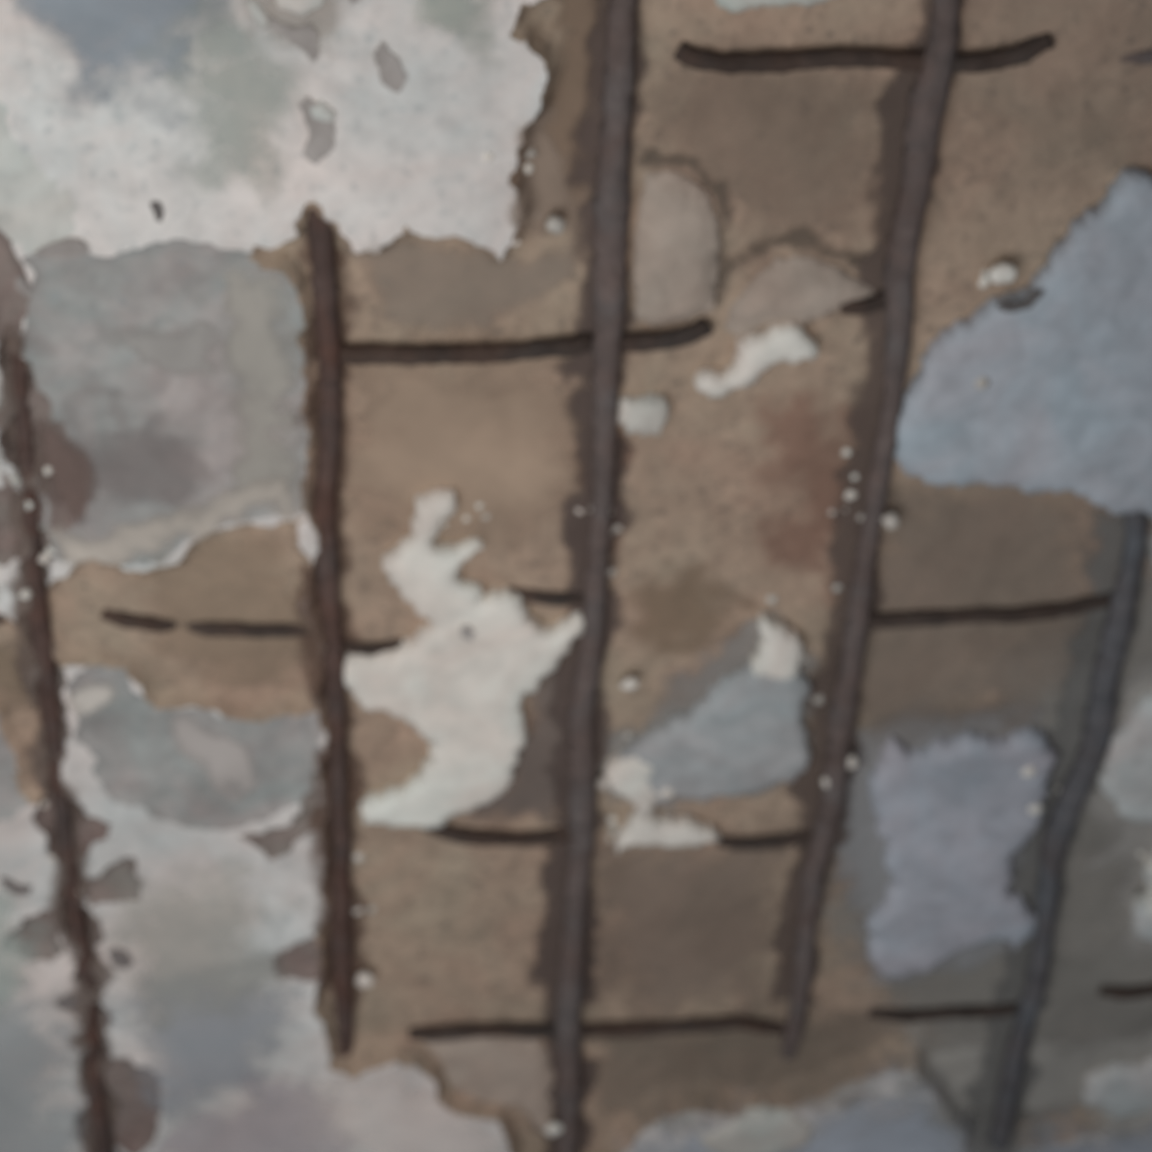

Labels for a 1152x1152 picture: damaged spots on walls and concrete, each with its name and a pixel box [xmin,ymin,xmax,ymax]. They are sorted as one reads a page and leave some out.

leakage [25,0,200,81]
peeling [247,0,324,63]
peeling [298,97,336,165]
corrosion [513,0,609,616]
corrosion [10,426,118,1152]
peeling [0,183,592,1152]
corrosion [309,698,363,987]
spalling [313,0,1152,1152]
corrosion [772,308,886,1000]
leakage [792,947,1010,1152]
leakage [1030,756,1152,1059]
leakage [1116,579,1152,704]